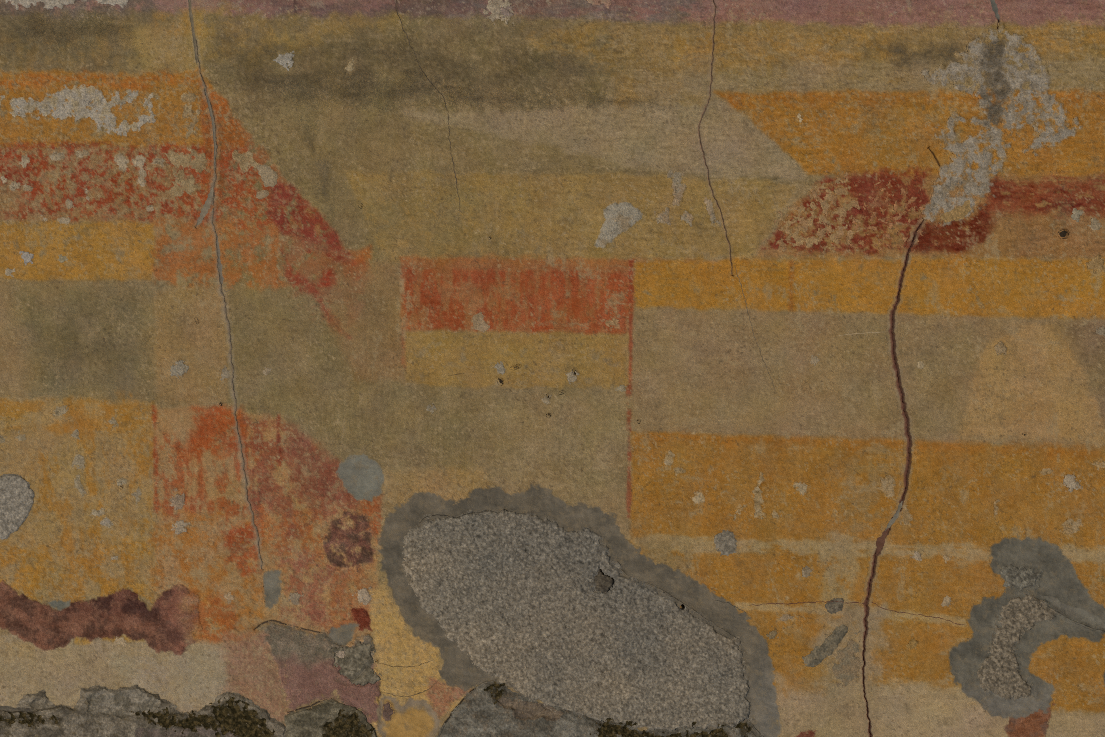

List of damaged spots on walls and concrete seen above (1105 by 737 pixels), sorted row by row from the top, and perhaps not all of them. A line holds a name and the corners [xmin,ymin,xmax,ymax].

peeling [3,0,128,11]
crack [988,0,1003,30]
peeling [0,84,208,197]
peeling [229,149,278,199]
peeling [594,168,694,249]
crack [695,0,775,390]
flaking render [771,23,1083,255]
crack [925,146,945,171]
crack [185,0,266,570]
flaking render [0,474,35,540]
flaking render [0,621,384,737]
flaking render [437,682,762,737]